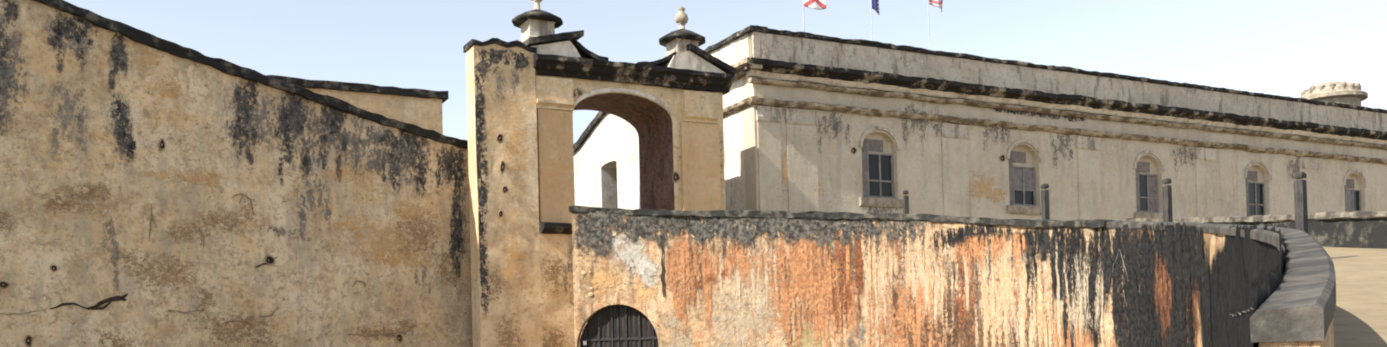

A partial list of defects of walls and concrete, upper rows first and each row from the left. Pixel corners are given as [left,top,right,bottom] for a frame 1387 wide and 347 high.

water stain [0,0,22,133]
water stain [44,13,136,163]
water stain [229,48,529,314]
crack [0,293,128,320]
corrosion [666,225,1114,347]
water stain [563,207,1286,347]